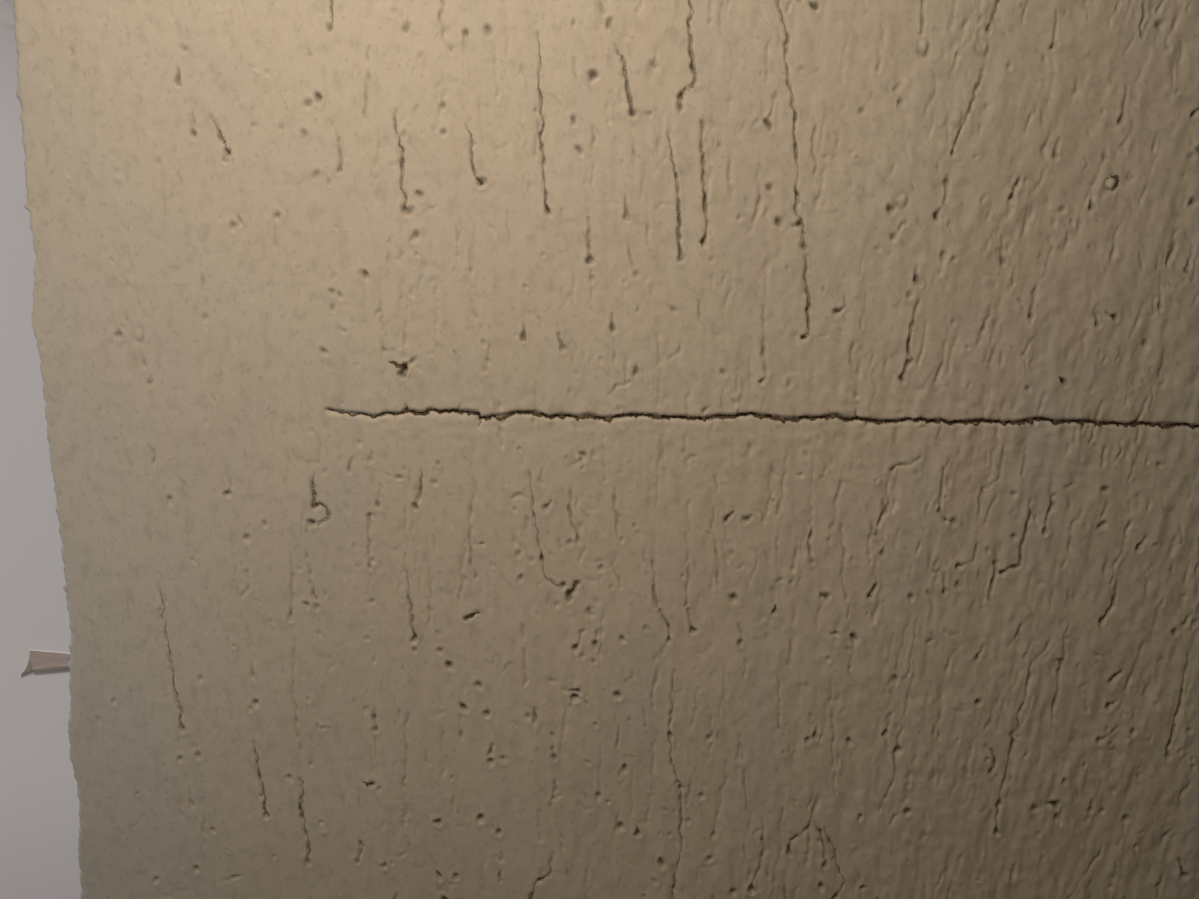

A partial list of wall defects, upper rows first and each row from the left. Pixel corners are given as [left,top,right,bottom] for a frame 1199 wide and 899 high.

crack [329,405,1199,429]